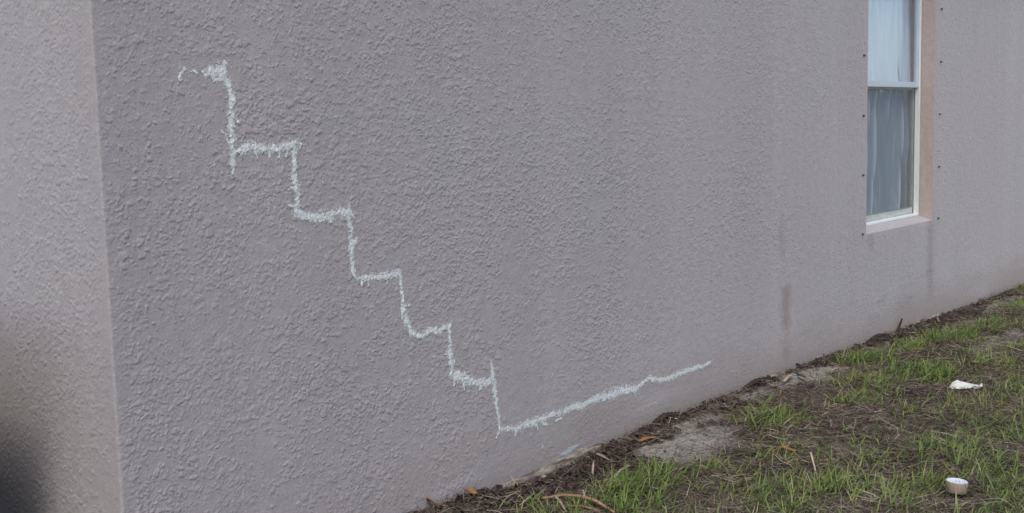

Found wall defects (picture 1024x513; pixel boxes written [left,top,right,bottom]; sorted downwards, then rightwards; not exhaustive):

crack [177,60,711,439]